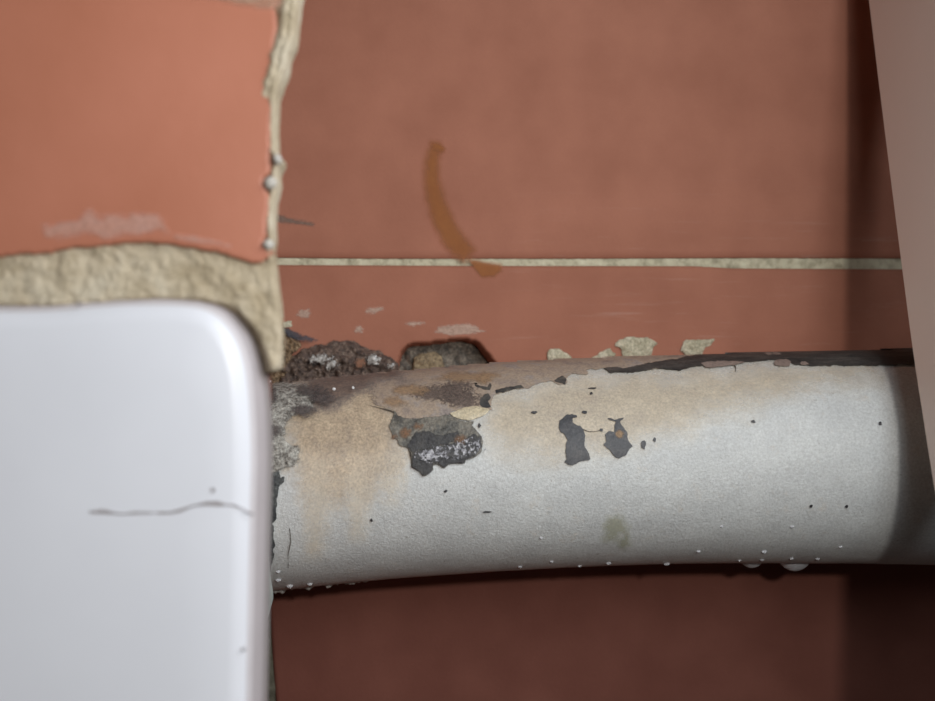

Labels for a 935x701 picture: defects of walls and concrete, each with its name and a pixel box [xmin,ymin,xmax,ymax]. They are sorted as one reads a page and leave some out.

corrosion [425,143,501,277]
peeling [368,337,915,428]
corrosion [283,371,486,498]
peeling [559,411,656,465]
peeling [270,470,285,572]